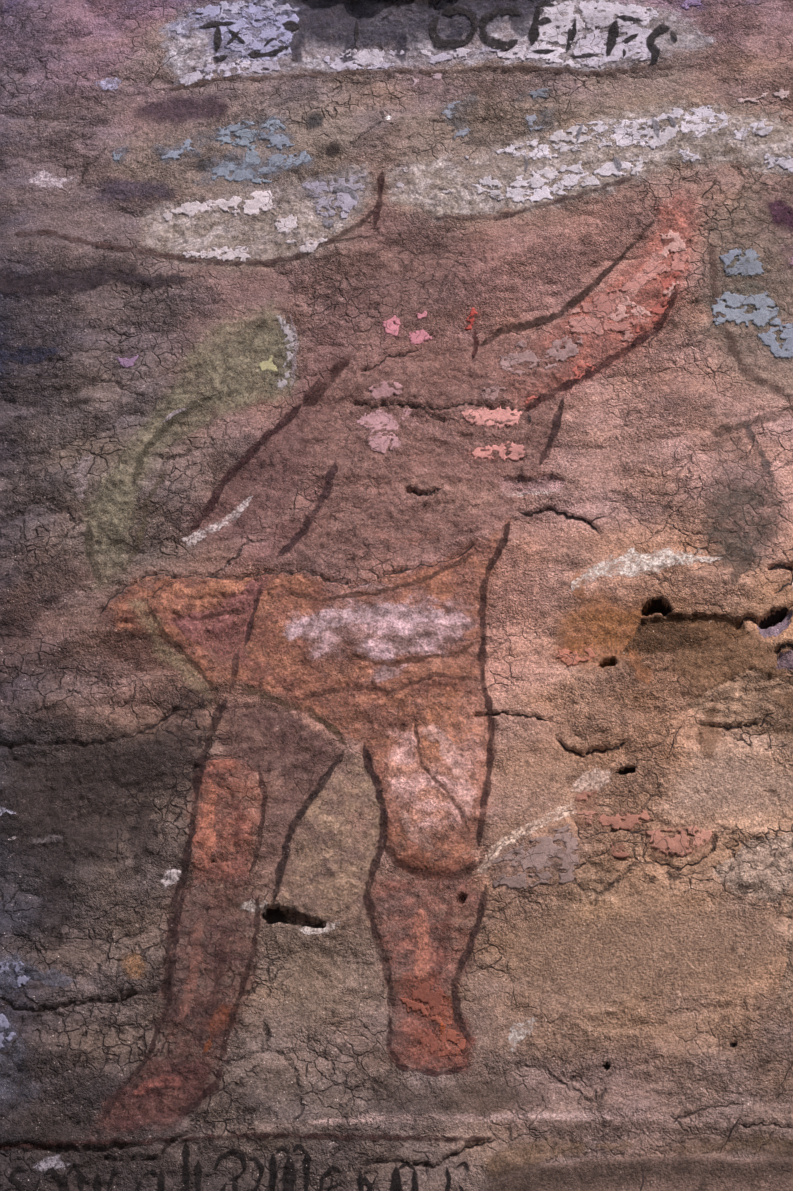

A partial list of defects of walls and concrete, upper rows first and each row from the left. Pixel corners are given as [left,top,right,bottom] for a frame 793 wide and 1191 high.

crack [519,508,610,533]
peeling [556,644,596,666]
flaking render [619,611,792,657]
flaking render [688,649,793,741]
peeling [492,789,712,890]
flaking render [712,833,793,1012]
crack [674,1061,793,1154]
crack [360,1139,495,1185]